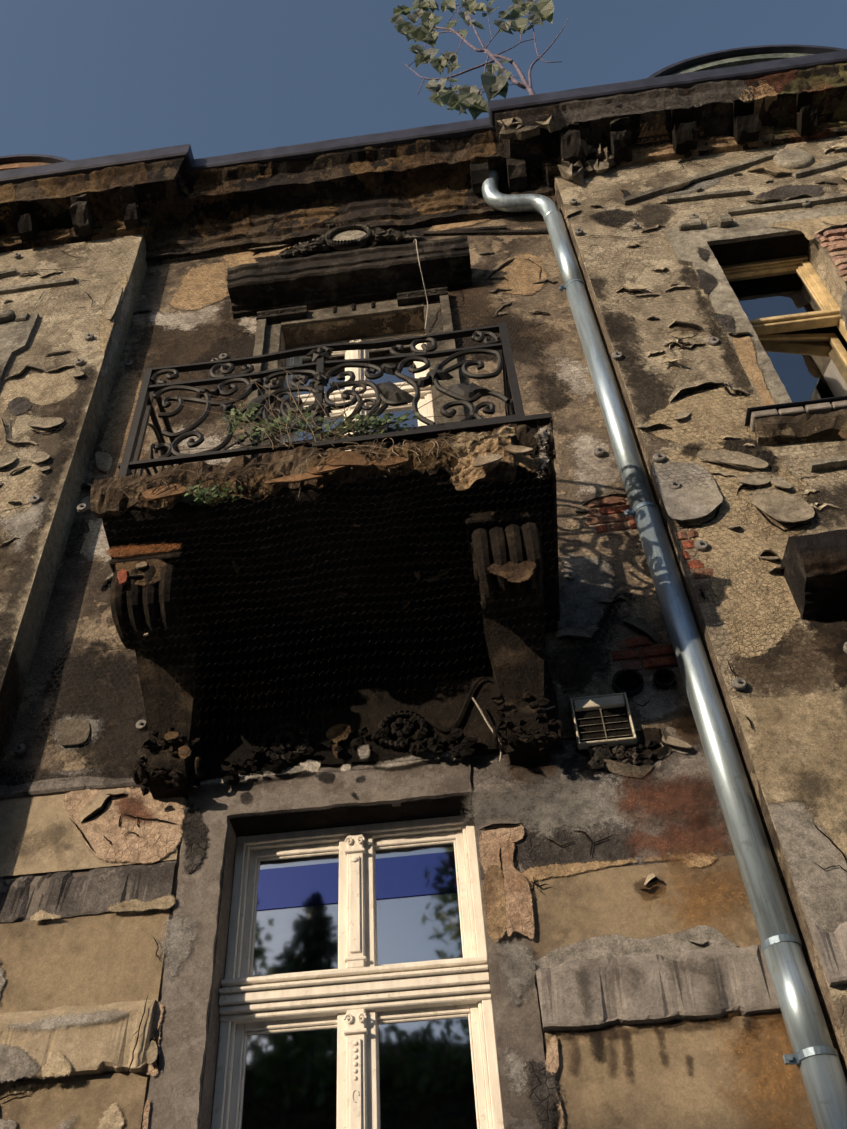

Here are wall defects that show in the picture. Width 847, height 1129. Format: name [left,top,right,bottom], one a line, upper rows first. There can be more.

spalling [0,183,77,248]
spalling [36,162,150,251]
spalling [275,206,338,231]
flaking render [769,214,847,282]
peeling [0,351,84,512]
peeling [64,244,291,560]
flaking render [575,489,638,534]
peeling [635,331,841,658]
peeling [63,786,187,864]
peeling [463,618,718,943]
crack [128,993,149,1073]
leakage [546,956,727,1081]